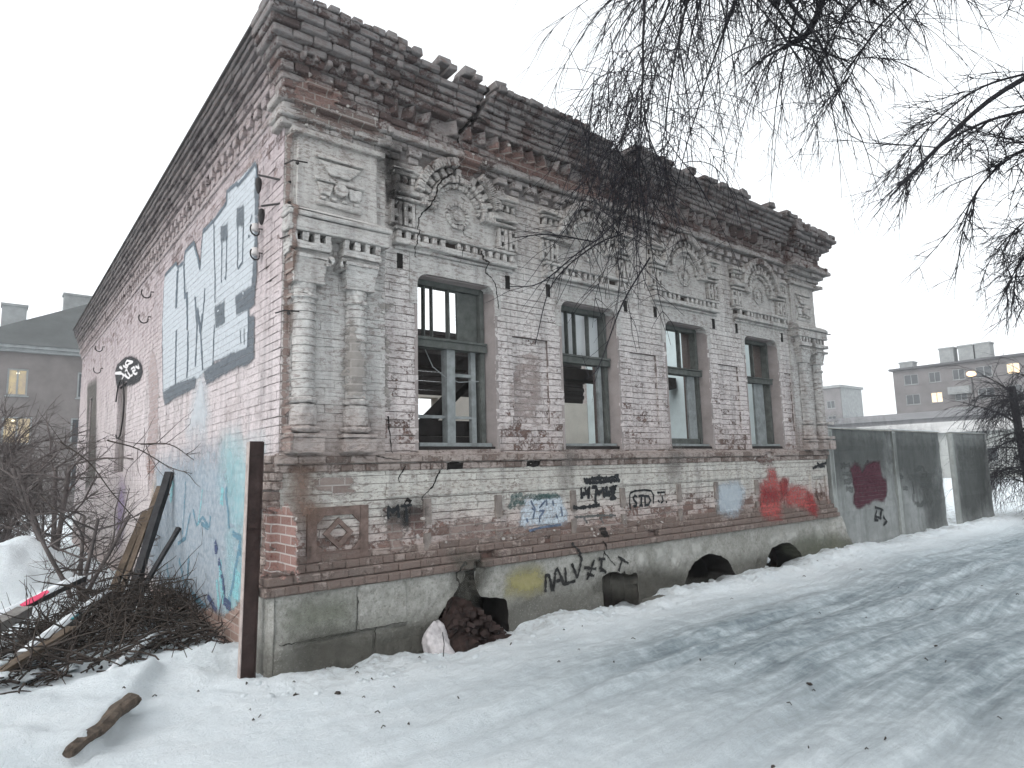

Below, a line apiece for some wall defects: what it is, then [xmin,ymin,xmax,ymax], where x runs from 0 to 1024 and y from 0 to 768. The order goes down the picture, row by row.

crack [457,85,490,143]